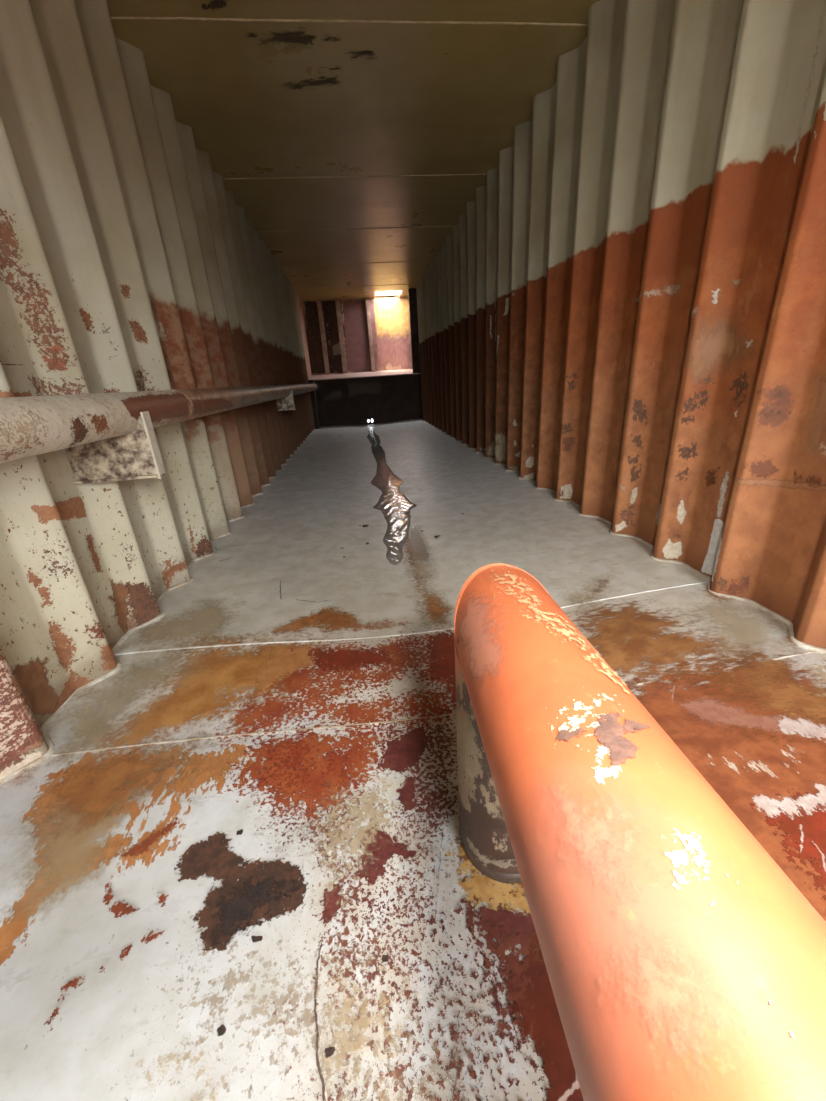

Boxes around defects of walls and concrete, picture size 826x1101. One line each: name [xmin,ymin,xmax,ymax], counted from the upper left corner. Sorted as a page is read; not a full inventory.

peeling [0,208,87,398]
peeling [28,538,78,608]
peeling [31,496,86,525]
rust [111,580,130,634]
peeling [107,525,213,629]
peeling [662,499,687,559]
peeling [701,472,729,582]
peeling [0,646,44,780]
peeling [41,620,117,716]
rust [0,596,501,965]
rust [556,576,826,921]
rust [43,976,85,1036]